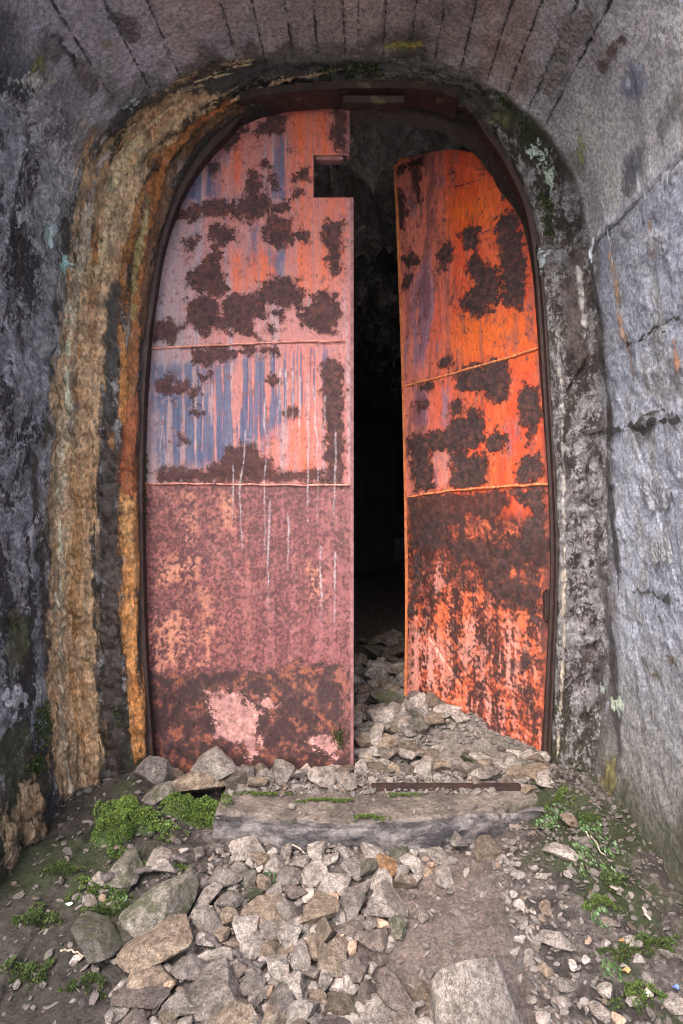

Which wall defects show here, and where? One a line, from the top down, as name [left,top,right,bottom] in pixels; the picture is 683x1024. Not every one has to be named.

corrosion [43,58,259,804]